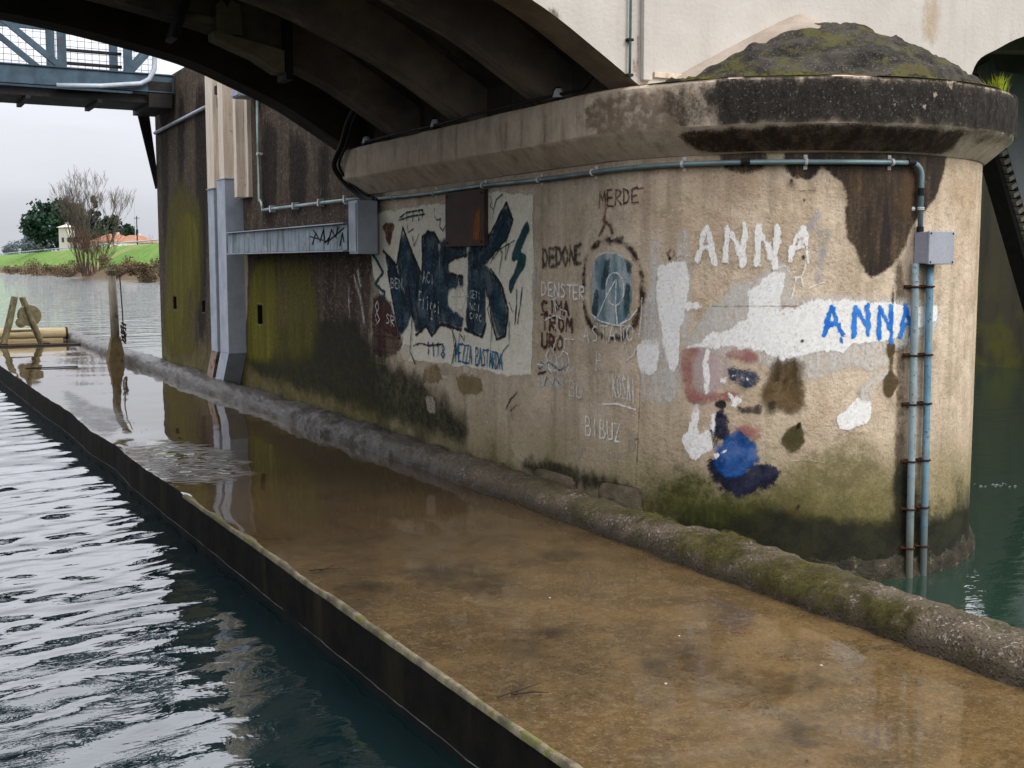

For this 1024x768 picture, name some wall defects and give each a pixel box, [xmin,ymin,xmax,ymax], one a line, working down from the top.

leakage [160,88,207,359]
leakage [246,256,318,360]
leakage [585,86,1017,304]
leakage [678,340,970,565]